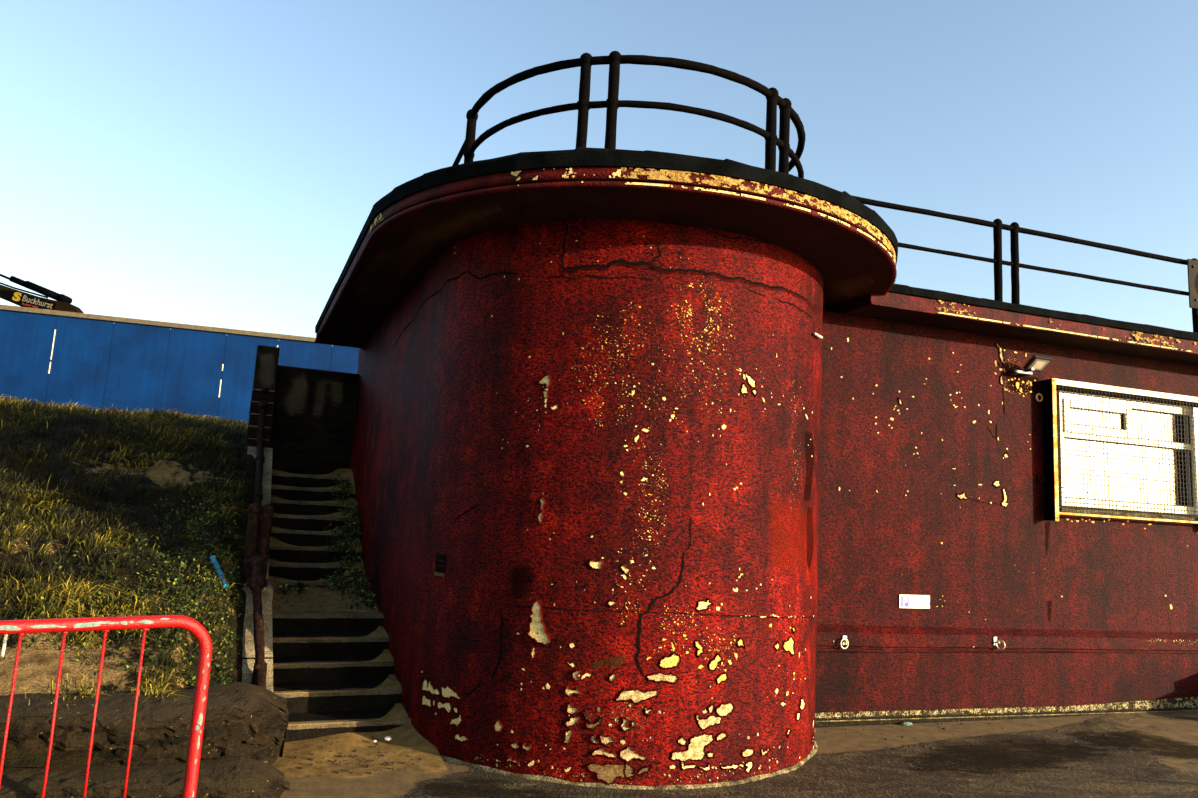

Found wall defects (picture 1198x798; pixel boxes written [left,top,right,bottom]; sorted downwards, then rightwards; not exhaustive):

crack [395,220,819,345]
peeling [511,167,897,291]
peeling [950,342,1036,423]
peeling [937,300,1196,352]
peeling [527,283,813,624]
peeling [941,480,1009,508]
crack [466,516,814,697]
peeling [421,671,470,743]
peeling [474,583,815,785]